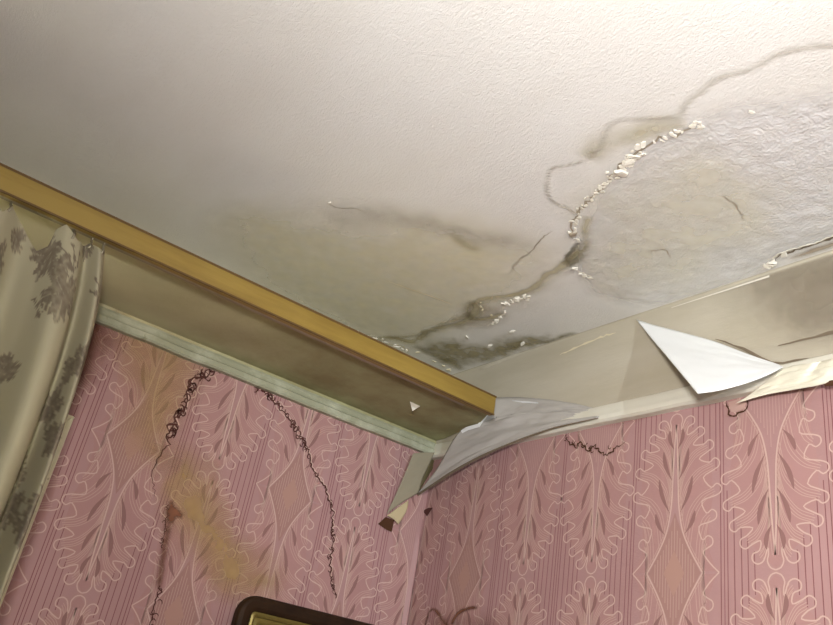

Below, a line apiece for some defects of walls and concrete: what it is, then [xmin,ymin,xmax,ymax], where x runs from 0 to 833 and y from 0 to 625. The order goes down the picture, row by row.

damp [266,227,583,343]
peeling [763,251,788,270]
damp [787,243,833,312]
damp [429,335,567,366]
crack [151,368,217,548]
crack [255,387,337,598]
peeling [387,452,434,524]
crack [149,585,163,625]